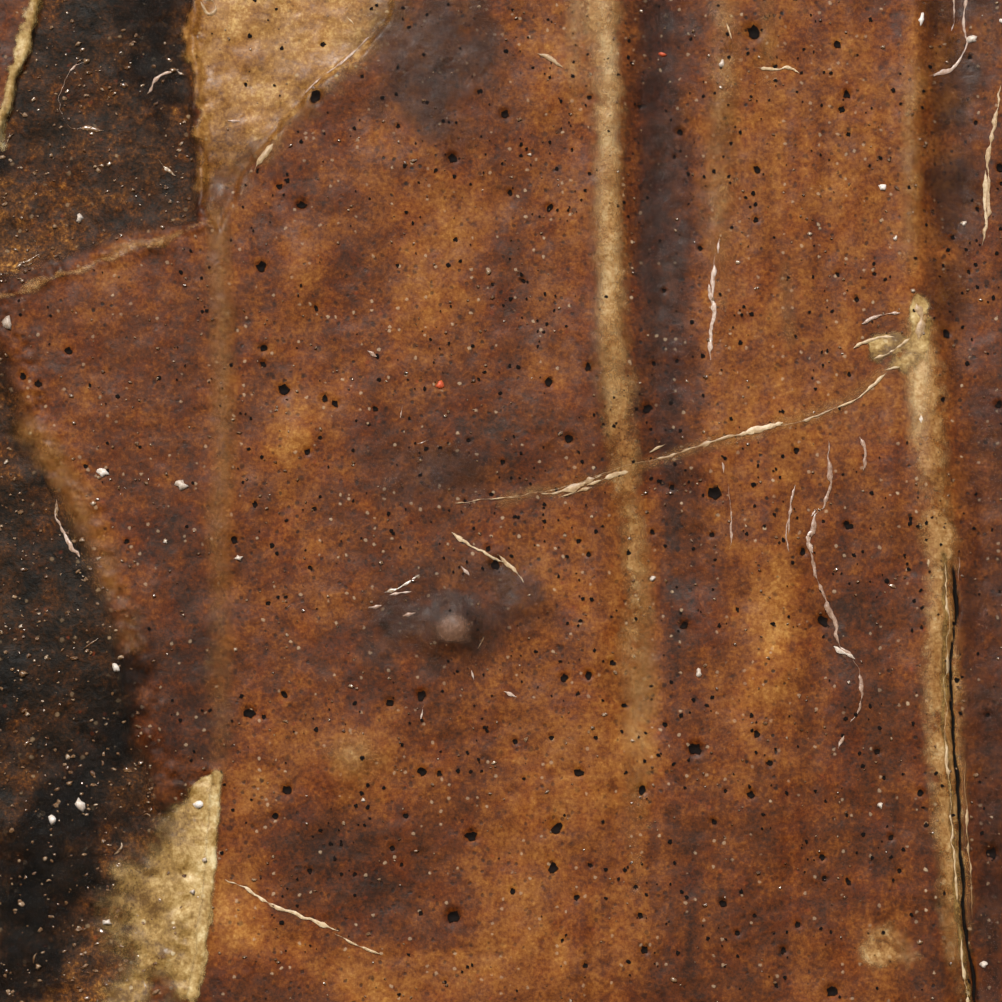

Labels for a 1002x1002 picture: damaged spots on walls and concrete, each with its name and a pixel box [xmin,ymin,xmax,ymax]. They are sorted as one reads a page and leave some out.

spalling [0,351,222,1002]
spalling [0,0,400,414]
leakage [572,0,646,586]
crack [785,444,863,748]
crack [859,438,867,470]
leakage [906,315,964,927]
crack [941,552,976,1002]